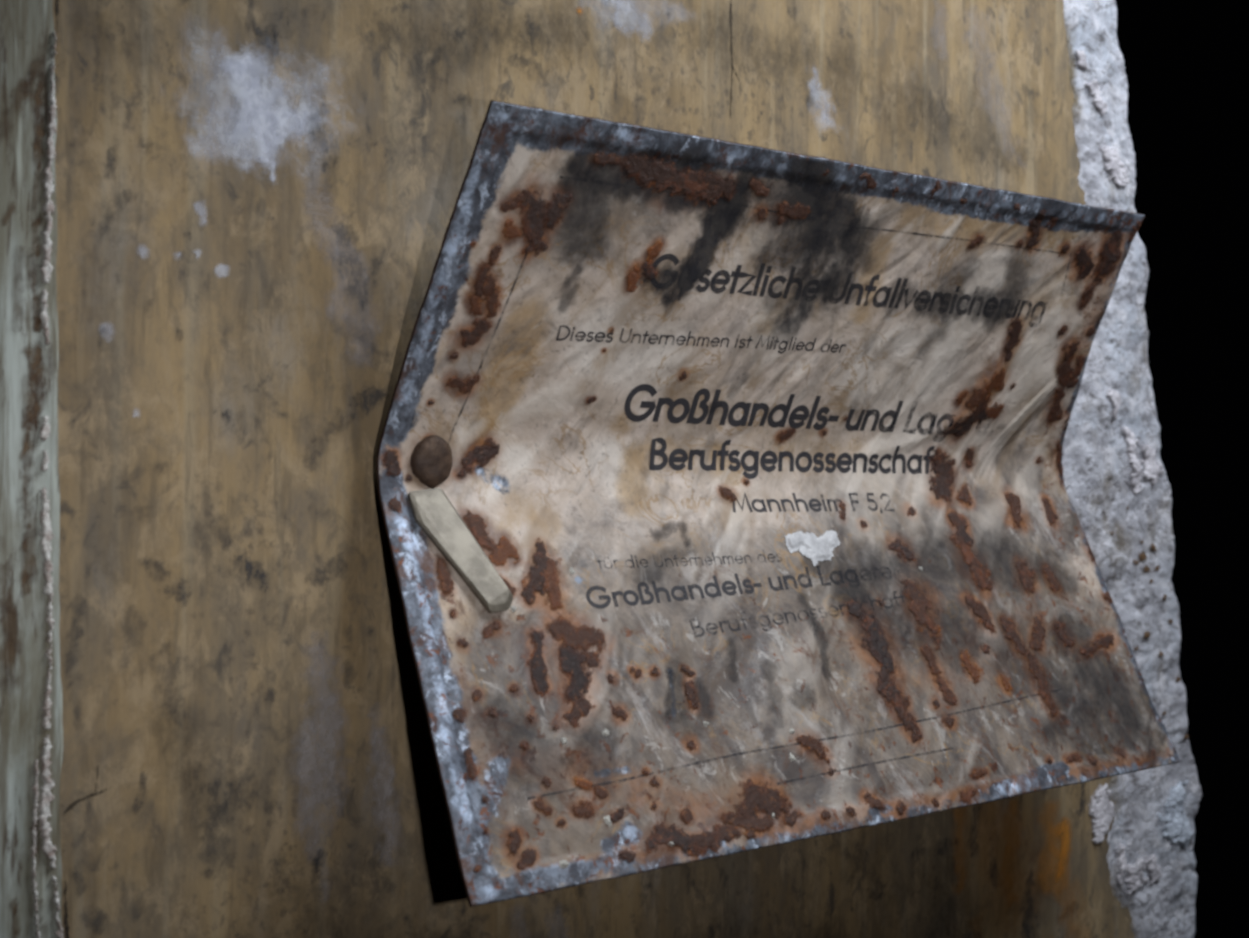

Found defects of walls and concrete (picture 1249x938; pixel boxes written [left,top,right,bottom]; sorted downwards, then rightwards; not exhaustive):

peeling [17,55,46,202]
water stain [221,21,320,181]
peeling [21,217,45,495]
peeling [0,511,36,682]